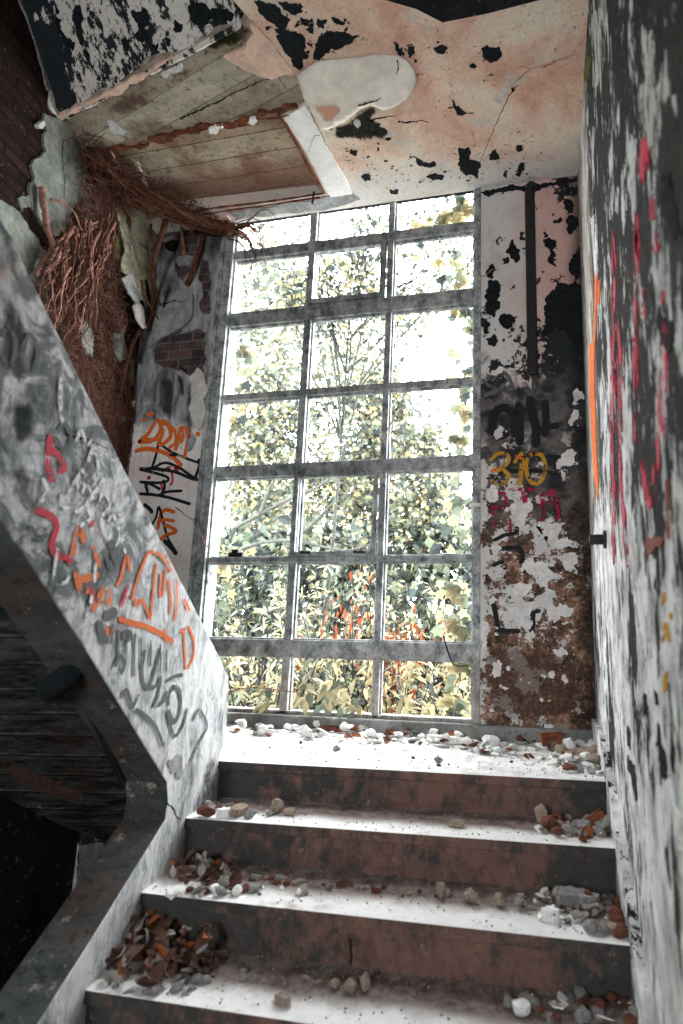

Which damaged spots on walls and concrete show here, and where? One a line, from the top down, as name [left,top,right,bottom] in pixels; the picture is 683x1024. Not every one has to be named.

spalling [18,0,360,149]
flaking render [393,41,448,63]
flaking render [343,145,578,197]
flaking render [469,42,502,69]
crack [468,52,579,182]
spalling [116,207,213,452]
peeling [483,231,526,347]
peeling [541,199,583,349]
peeling [494,426,507,449]
peeling [556,449,579,482]
peeling [568,388,585,426]
peeling [480,484,578,712]